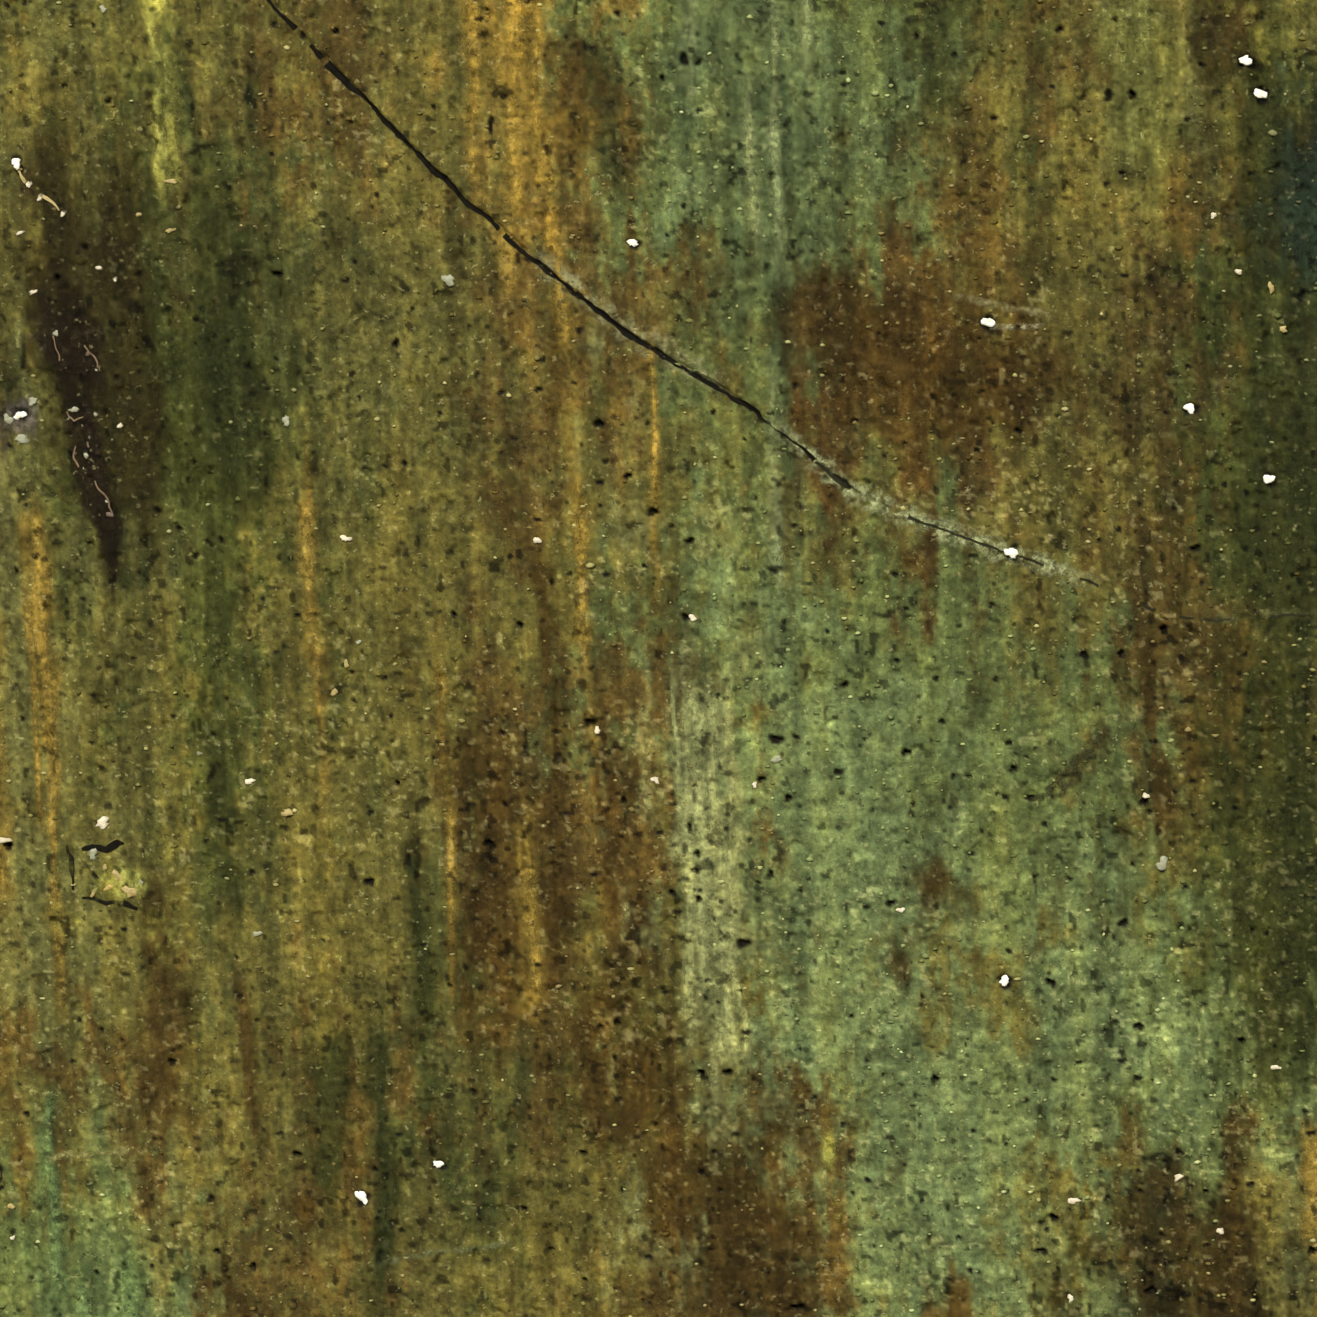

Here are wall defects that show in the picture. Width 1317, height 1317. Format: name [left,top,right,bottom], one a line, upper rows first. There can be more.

damp [32,12,279,910]
corrosion [299,487,323,718]
corrosion [569,434,591,696]
corrosion [649,351,658,547]
crack [267,0,1099,587]
corrosion [779,282,1074,458]
damp [1193,0,1317,1105]
corrosion [582,1017,815,1317]
damp [1094,1128,1268,1317]
damp [1304,1136,1317,1262]